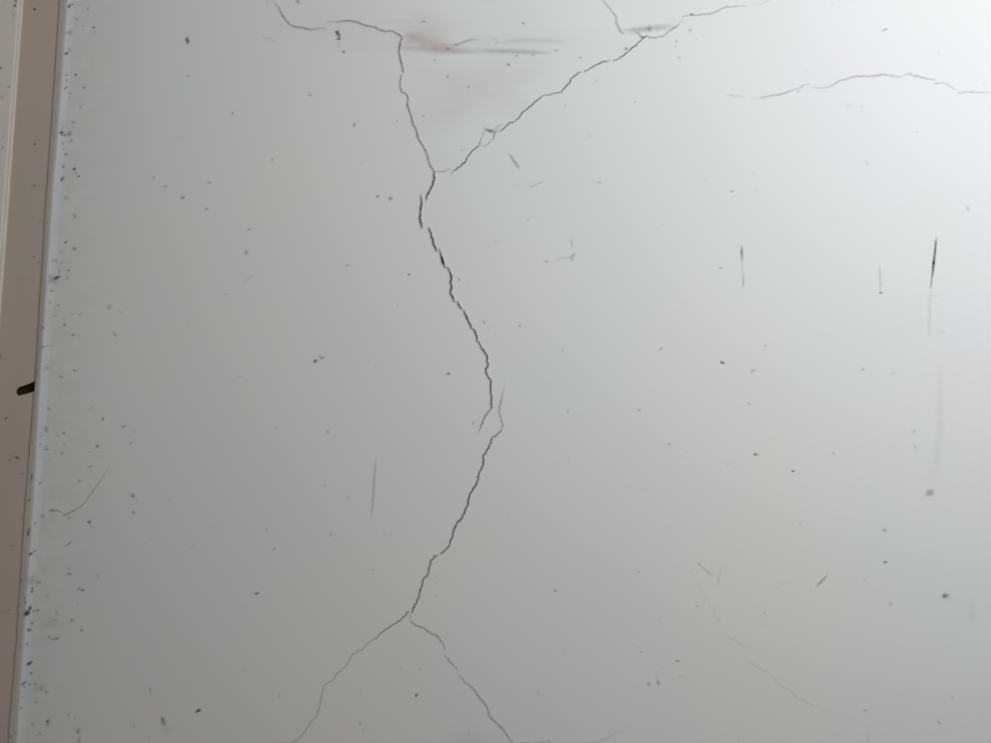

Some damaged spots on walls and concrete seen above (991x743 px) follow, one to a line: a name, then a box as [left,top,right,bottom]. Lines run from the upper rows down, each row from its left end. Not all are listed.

crack [265,0,748,651]